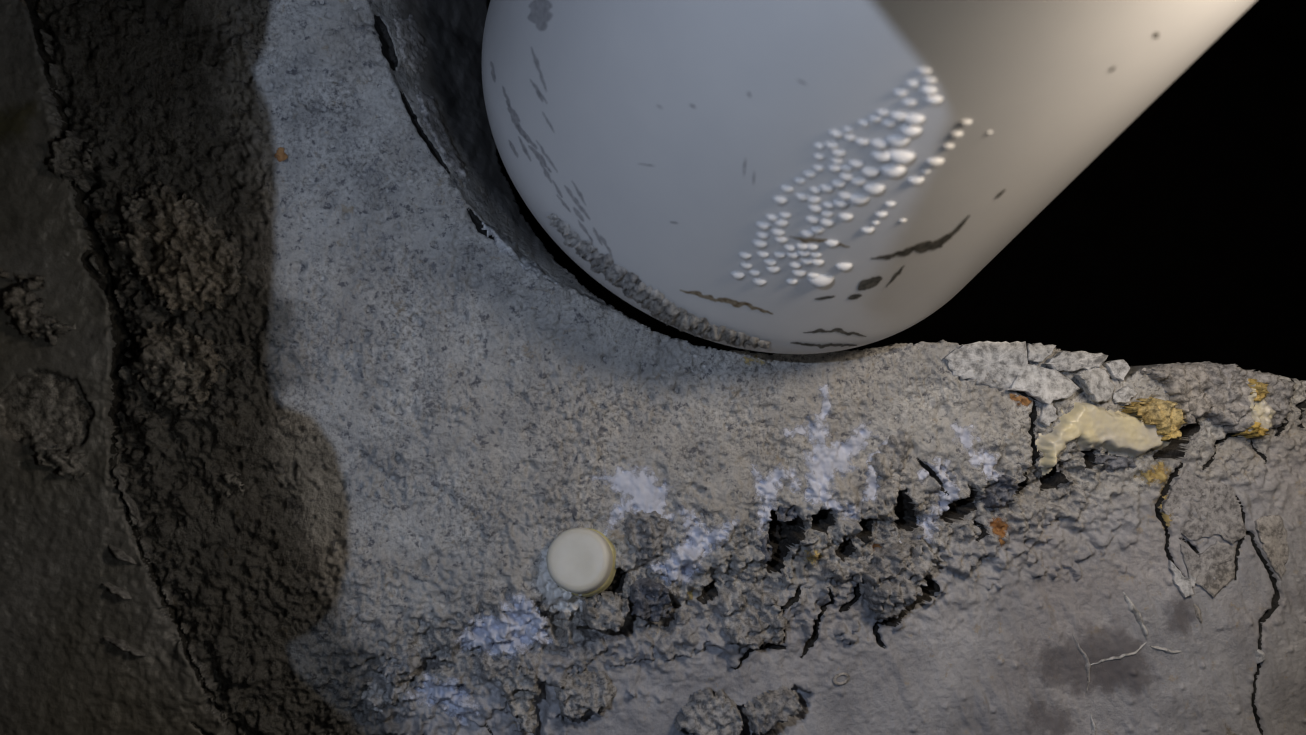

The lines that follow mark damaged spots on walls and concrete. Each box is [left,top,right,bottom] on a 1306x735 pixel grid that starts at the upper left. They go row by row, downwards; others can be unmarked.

crack [24,0,70,138]
crack [71,181,241,735]
efflorescence [455,546,585,660]
spalling [578,510,682,632]
efflorescence [592,464,737,586]
efflorescence [751,385,888,535]
spalling [760,488,940,627]
water stain [916,456,961,544]
peeling [940,341,1296,598]
crack [1155,377,1306,577]
crack [1234,496,1280,735]
spalling [674,685,803,735]